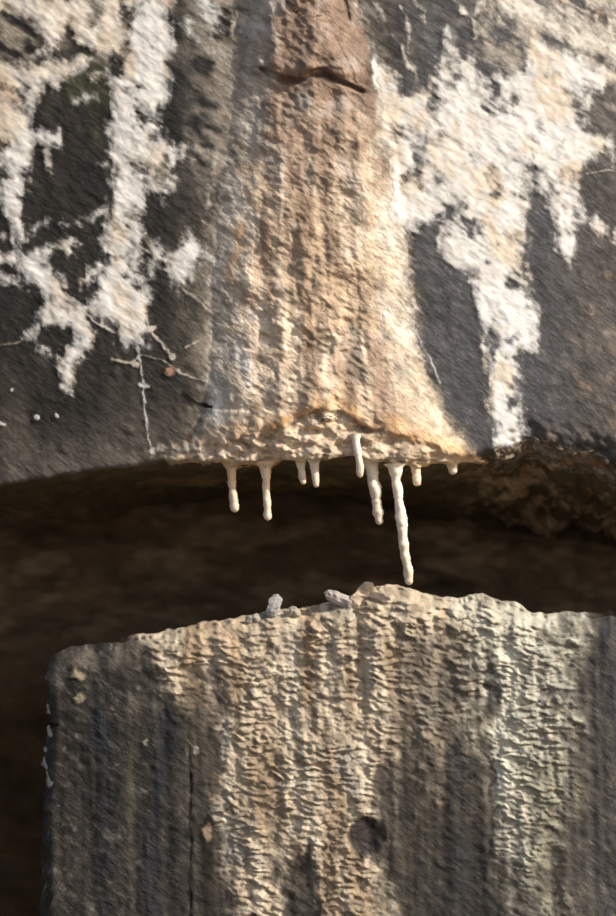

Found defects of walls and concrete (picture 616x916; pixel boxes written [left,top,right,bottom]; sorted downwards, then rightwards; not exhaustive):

leakage [0,0,616,469]
spalling [494,438,616,490]
crack [185,713,193,911]
leakage [130,584,610,916]